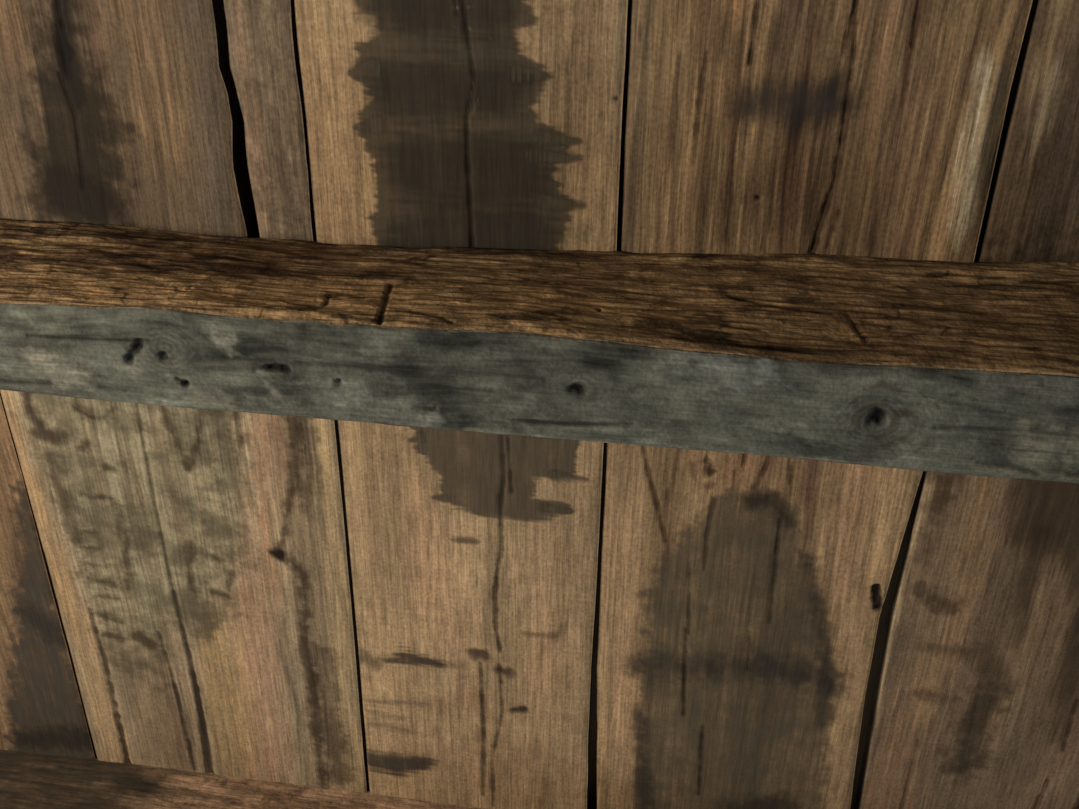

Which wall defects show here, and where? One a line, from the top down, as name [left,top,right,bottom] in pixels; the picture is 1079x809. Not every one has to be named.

damp [34,0,120,224]
damp [348,0,585,251]
damp [23,392,61,444]
damp [409,427,587,521]
damp [0,488,160,809]
damp [639,495,833,809]